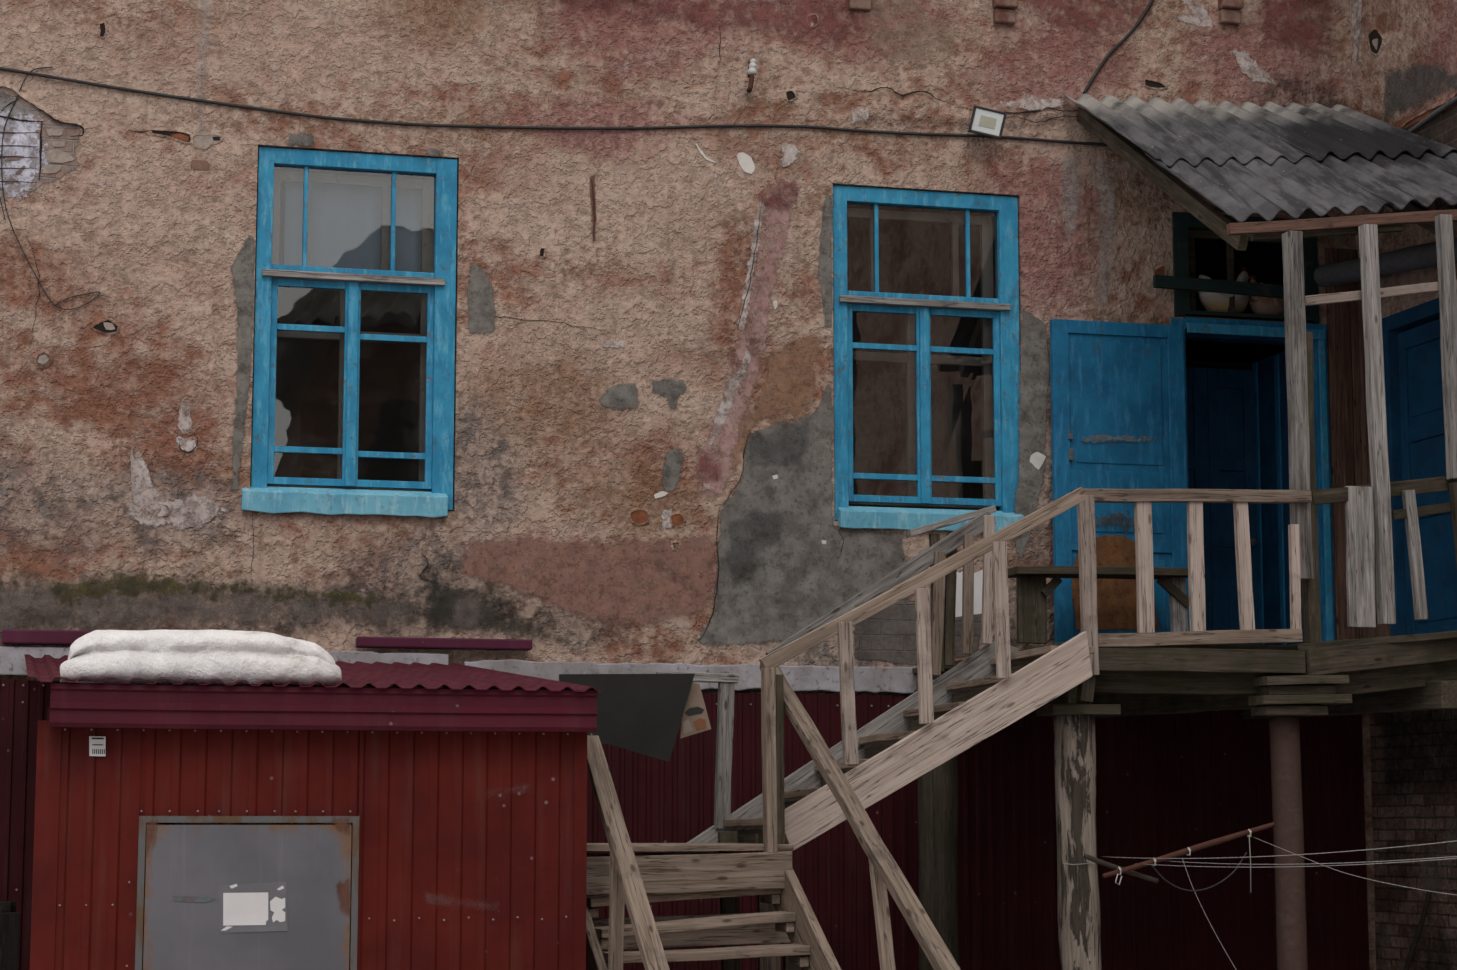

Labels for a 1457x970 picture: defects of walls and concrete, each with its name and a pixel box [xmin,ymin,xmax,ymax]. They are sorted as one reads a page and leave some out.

spalling [1351,0,1385,69]
spalling [0,81,84,198]
spalling [1392,91,1457,153]
spalling [1421,199,1457,210]